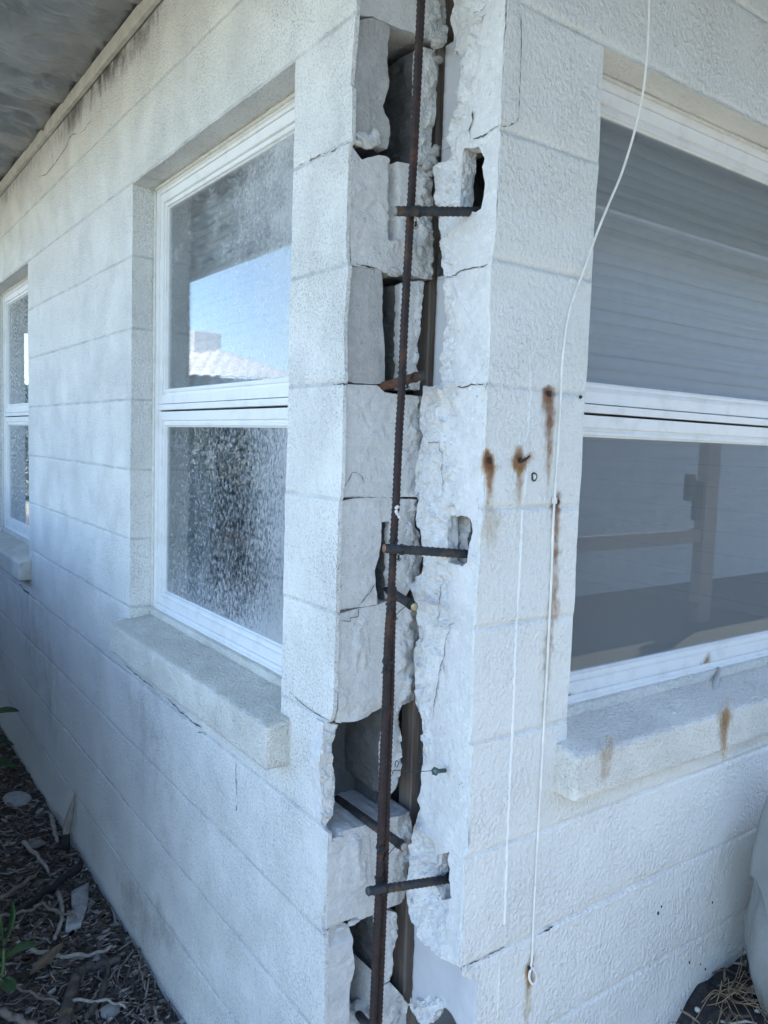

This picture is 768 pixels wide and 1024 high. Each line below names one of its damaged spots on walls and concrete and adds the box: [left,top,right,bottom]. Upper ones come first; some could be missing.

corrosion [544,387,554,468]
corrosion [483,450,495,494]
corrosion [514,449,531,485]
spalling [310,0,506,1024]
corrosion [552,494,560,562]
crack [341,583,376,622]
crack [433,578,451,712]
corrosion [722,707,730,754]